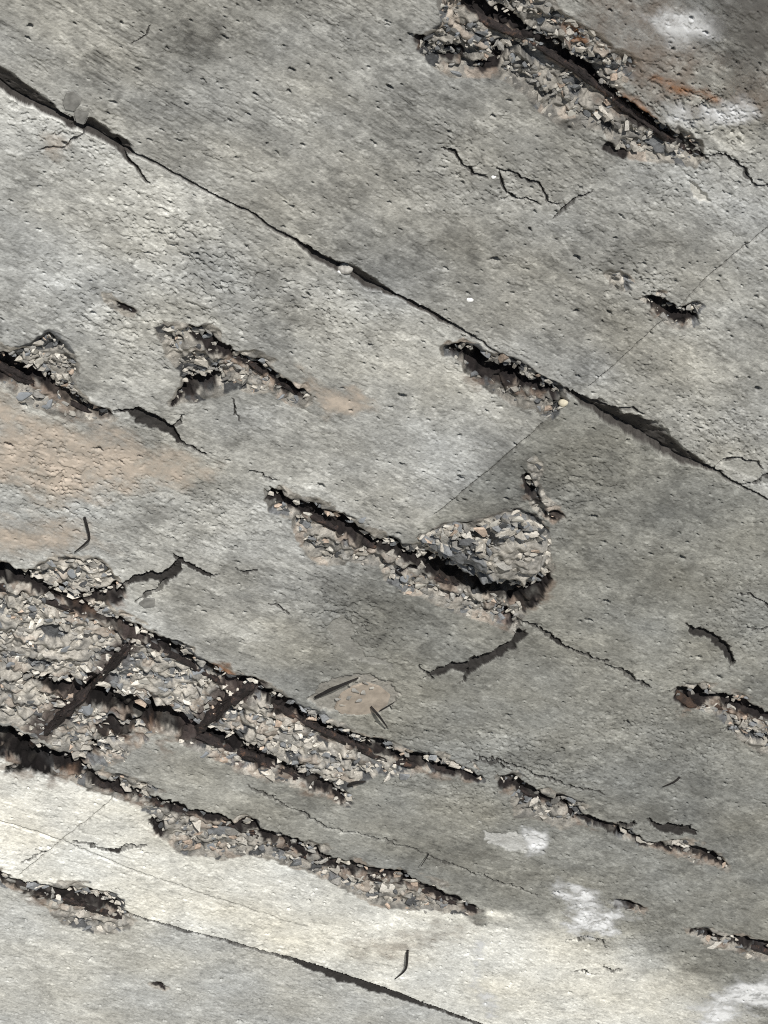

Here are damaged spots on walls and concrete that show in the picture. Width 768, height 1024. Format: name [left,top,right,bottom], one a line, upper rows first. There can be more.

spalling [416,0,711,204]
crack [441,146,594,220]
crack [702,152,768,189]
spalling [153,320,313,410]
spalling [440,338,569,420]
crack [111,406,207,457]
crack [714,456,768,486]
spalling [263,456,565,635]
crack [418,616,652,689]
crack [685,592,768,669]
spalling [0,554,732,916]
spalling [0,866,138,936]